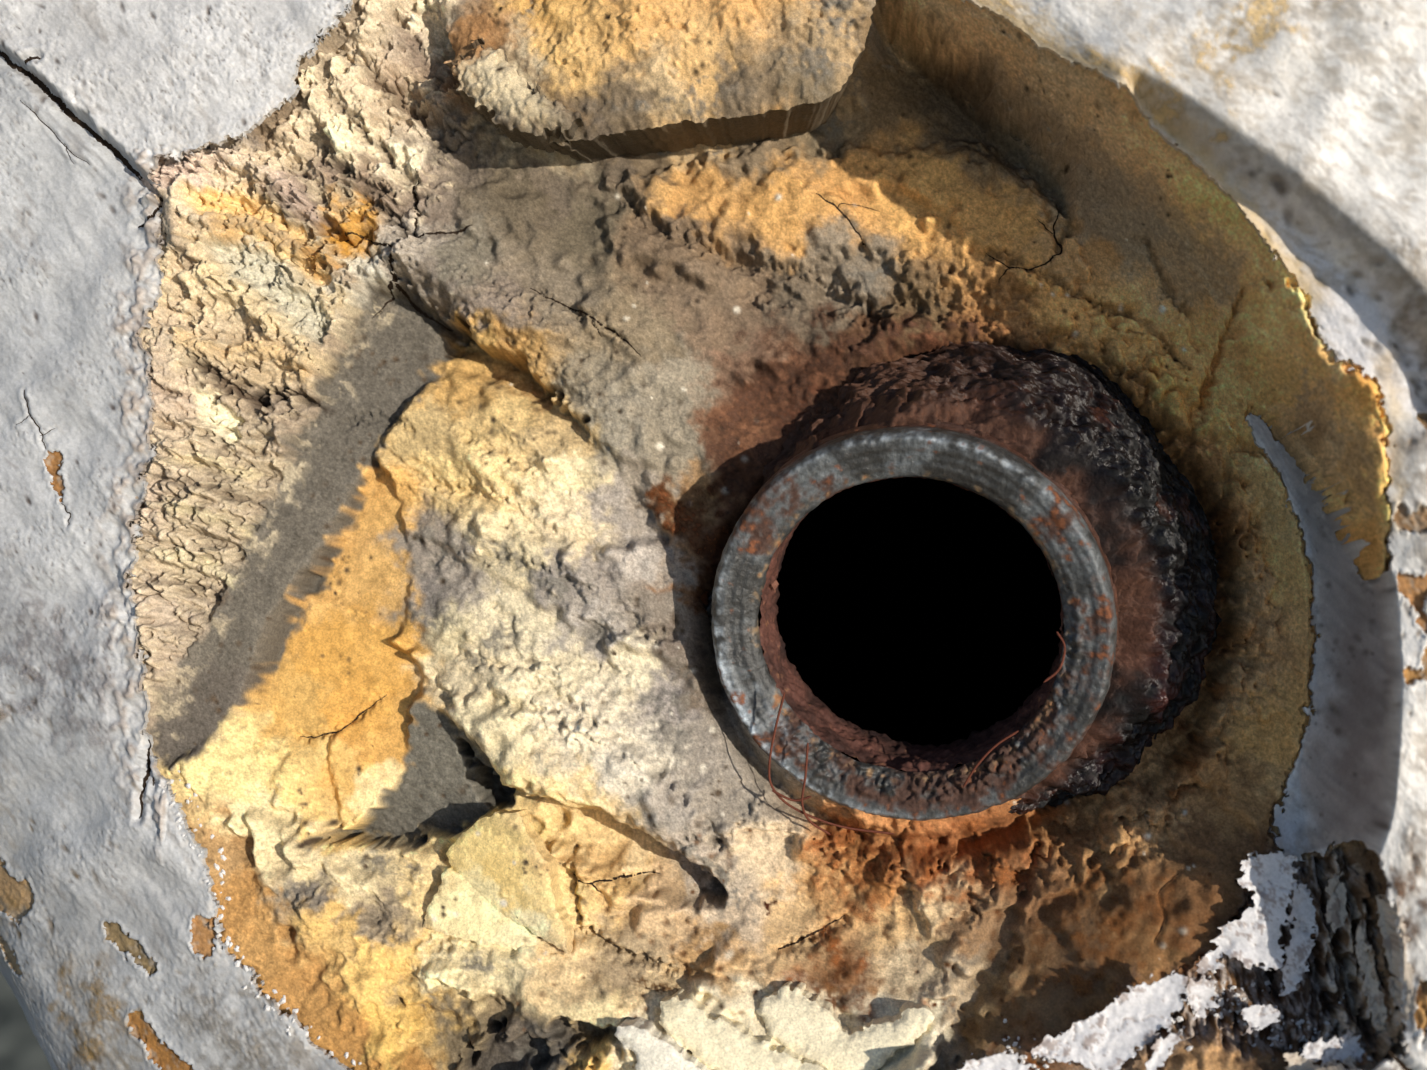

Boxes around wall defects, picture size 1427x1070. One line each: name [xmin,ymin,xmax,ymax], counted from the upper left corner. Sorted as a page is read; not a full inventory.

crack [0,51,178,254]
corrosion [645,304,984,614]
peeling [1393,503,1427,535]
peeling [1396,572,1427,685]
peeling [103,921,157,976]
peeling [190,915,217,960]
peeling [957,851,1427,1070]
peeling [127,1011,193,1070]
crack [1388,1007,1427,1070]